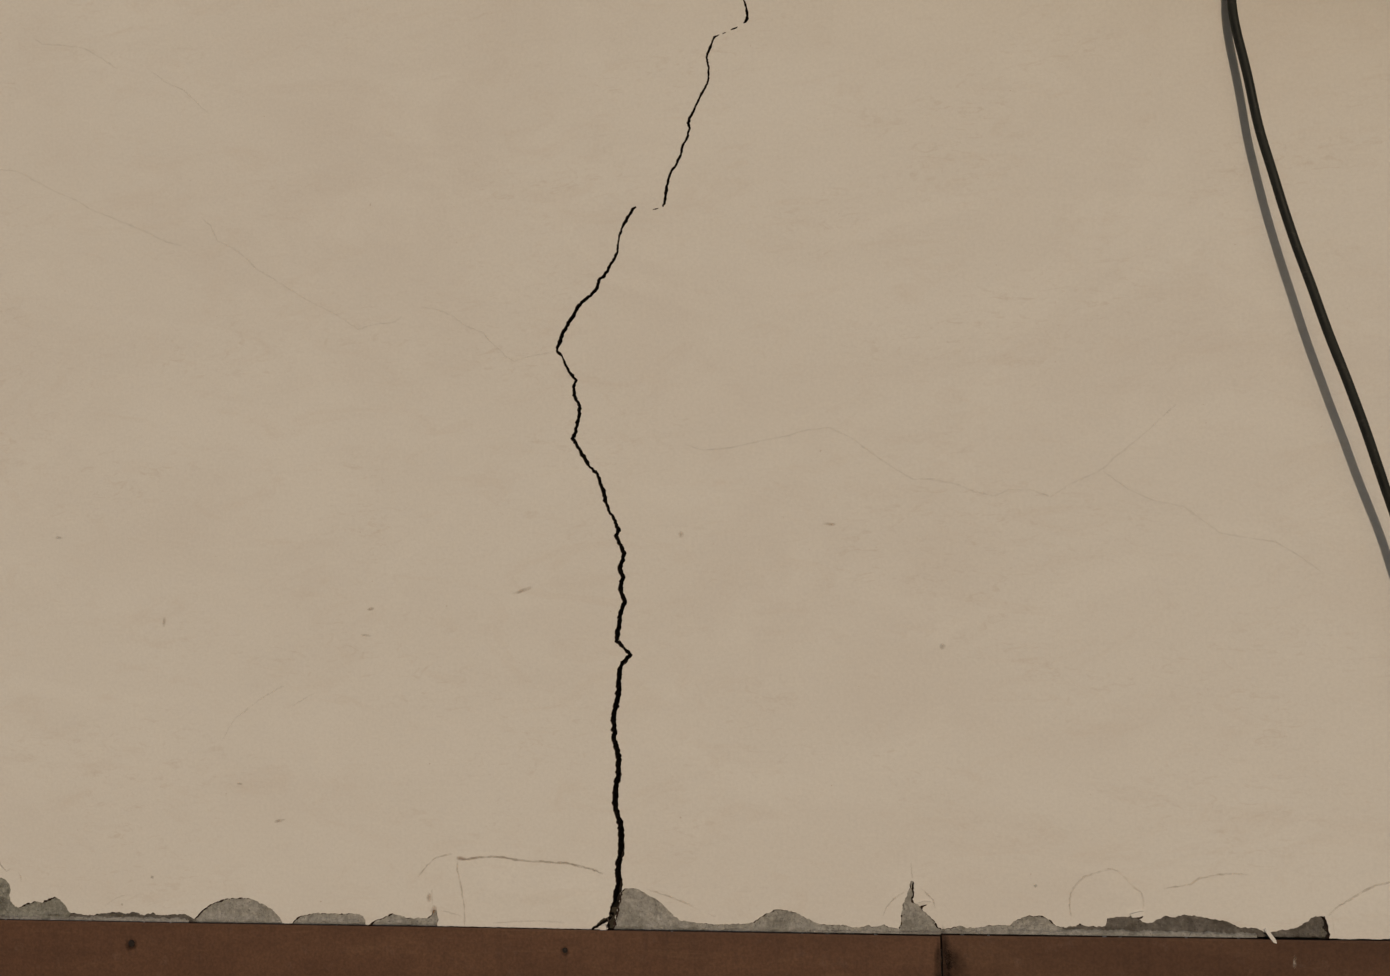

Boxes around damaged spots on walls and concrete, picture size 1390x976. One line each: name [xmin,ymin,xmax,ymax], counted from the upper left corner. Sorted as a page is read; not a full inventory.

crack [556,0,749,930]
flaking render [0,878,439,926]
flaking render [600,881,1330,944]